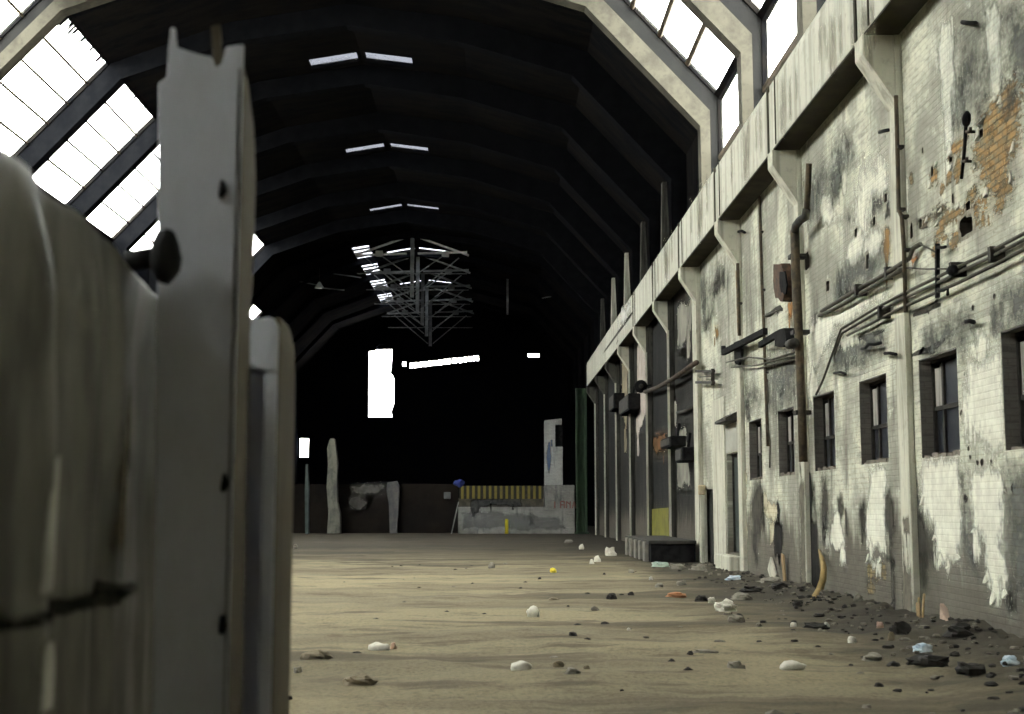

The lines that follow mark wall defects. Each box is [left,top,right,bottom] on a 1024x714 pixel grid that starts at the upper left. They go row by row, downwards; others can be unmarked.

water stain [832,169,842,206]
spalling [910,70,1024,259]
water stain [750,482,783,564]
peeling [826,511,846,565]
peeling [865,466,887,594]
peeling [919,330,1012,606]